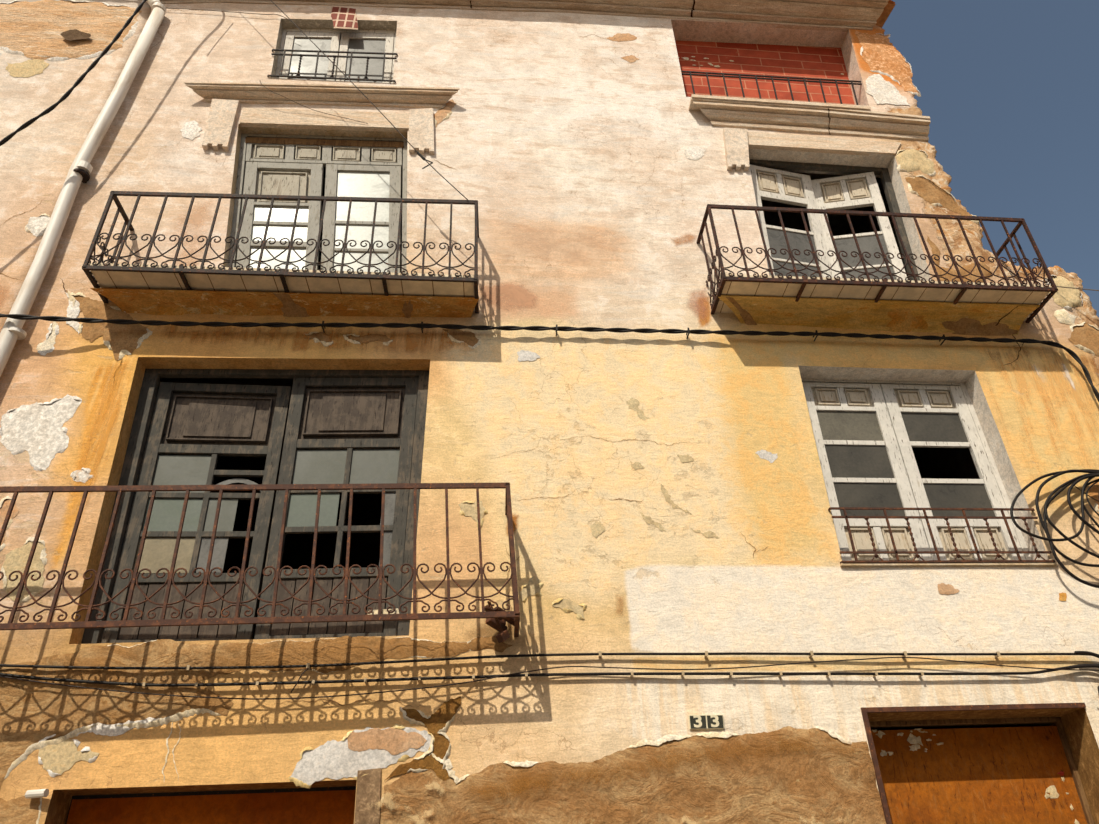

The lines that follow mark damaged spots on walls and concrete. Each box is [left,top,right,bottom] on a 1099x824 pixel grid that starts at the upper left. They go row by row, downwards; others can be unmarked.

flaking render [0,0,142,78]
flaking render [855,31,921,105]
flaking render [36,290,153,361]
flaking render [0,394,82,471]
flaking render [0,636,512,824]
flaking render [288,696,943,824]